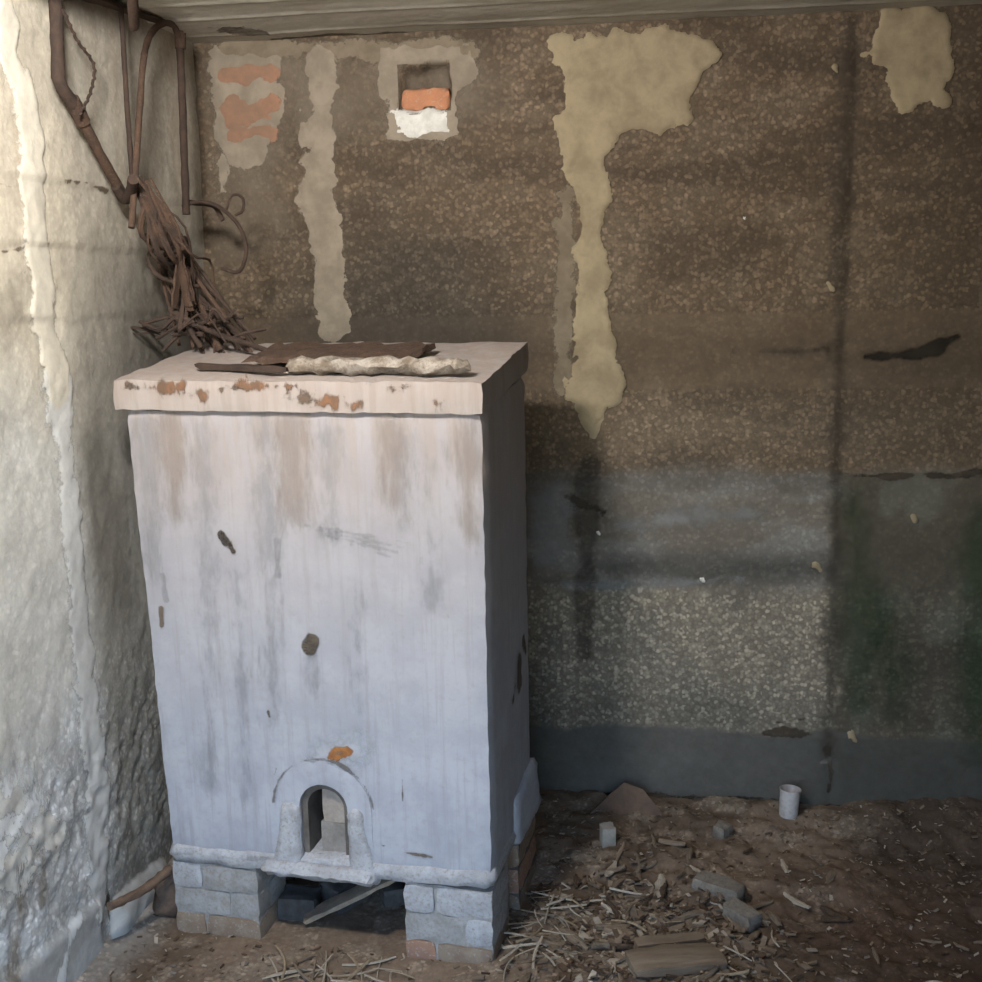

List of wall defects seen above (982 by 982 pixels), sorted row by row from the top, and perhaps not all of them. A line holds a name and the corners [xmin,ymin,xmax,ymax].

flaking render [206,45,287,193]
flaking render [377,43,479,144]
crack [67,180,108,194]
crack [856,468,982,481]
leakage [0,773,67,898]
leakage [57,908,83,982]